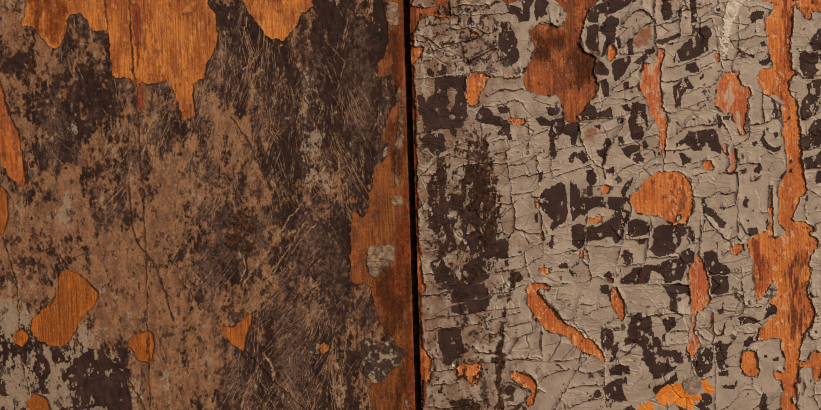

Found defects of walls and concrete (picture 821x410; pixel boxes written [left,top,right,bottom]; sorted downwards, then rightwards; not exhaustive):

peeling [22,0,219,121]
peeling [242,0,314,41]
peeling [0,82,26,187]
peeling [0,187,9,235]
peeling [349,0,821,410]
crack [416,0,782,410]
spalling [0,378,9,410]
spalling [13,270,132,410]